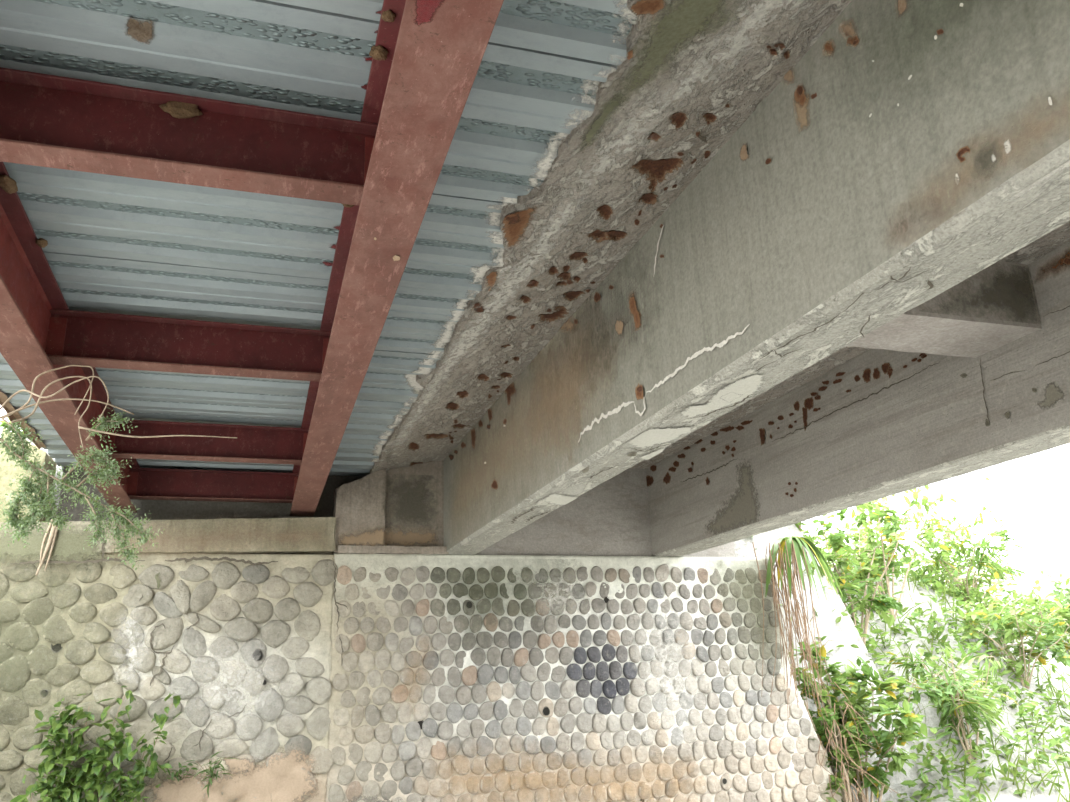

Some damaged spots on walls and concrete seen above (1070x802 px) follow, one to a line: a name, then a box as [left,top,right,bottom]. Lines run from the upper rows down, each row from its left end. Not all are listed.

peeling [415,0,445,25]
corrosion [501,208,534,247]
corrosion [486,272,498,291]
corrosion [1036,250,1070,280]
corrosion [629,294,641,331]
corrosion [504,383,516,405]
corrosion [635,384,644,400]
crack [578,324,750,443]
crack [980,351,1070,422]
corrosion [449,408,492,460]
peeling [626,353,927,487]